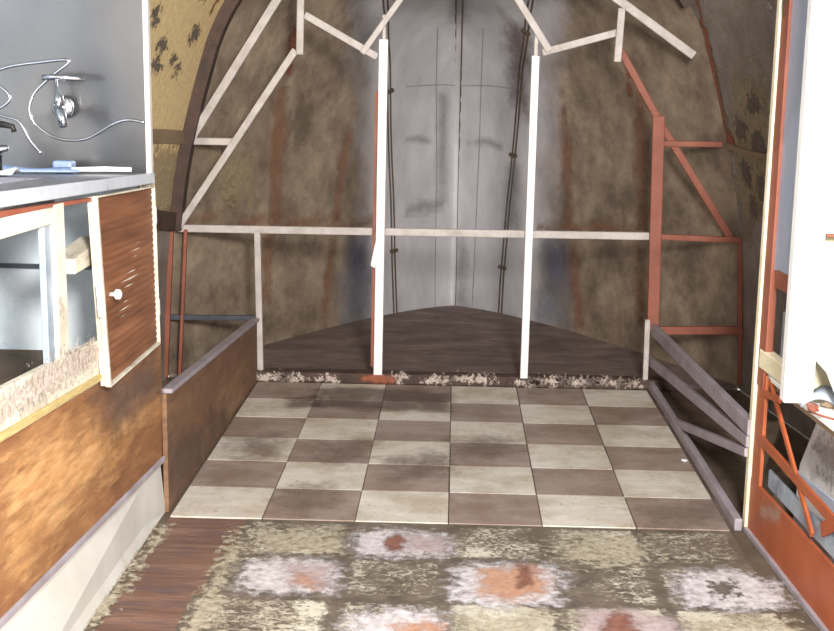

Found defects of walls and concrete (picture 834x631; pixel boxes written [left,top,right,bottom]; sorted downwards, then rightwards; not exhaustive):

rust [696,0,727,131]